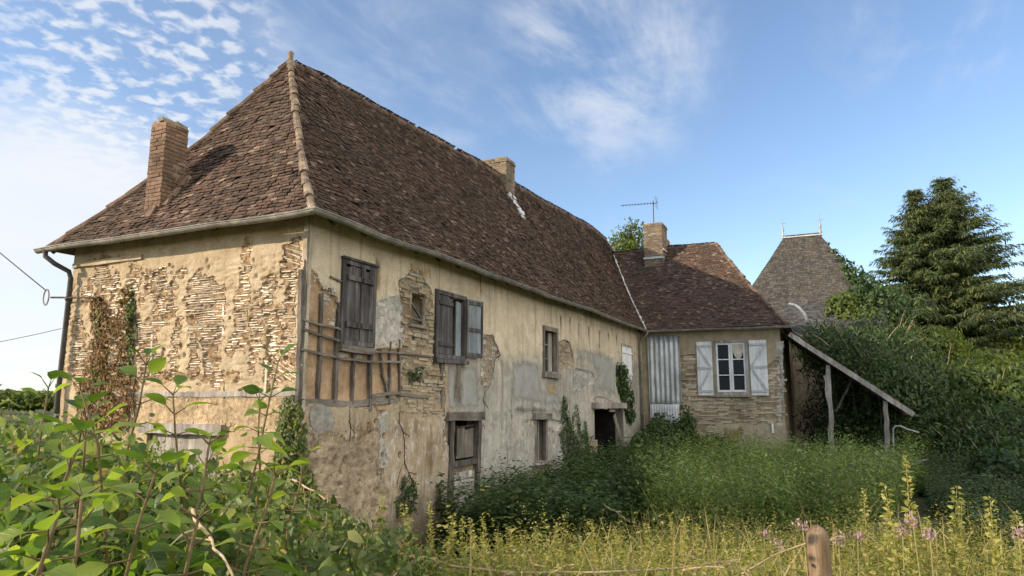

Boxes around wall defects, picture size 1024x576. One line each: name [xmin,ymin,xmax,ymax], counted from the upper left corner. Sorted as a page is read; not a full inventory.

peeling [69,236,448,528]
spalling [480,334,500,390]
spalling [559,340,574,370]
crack [397,414,419,499]